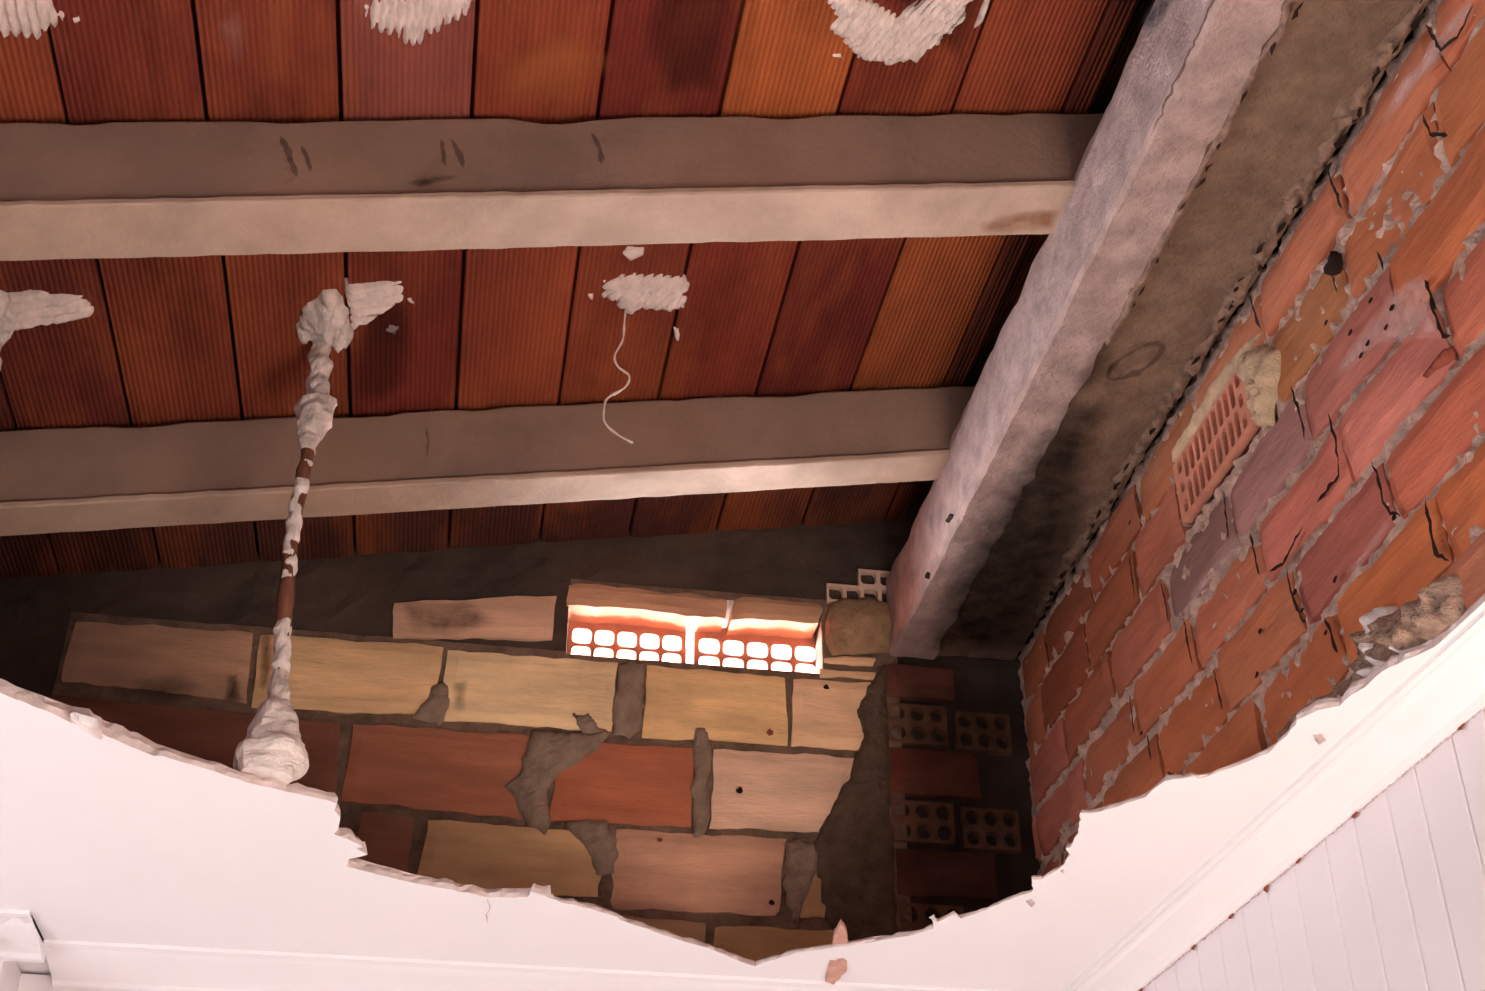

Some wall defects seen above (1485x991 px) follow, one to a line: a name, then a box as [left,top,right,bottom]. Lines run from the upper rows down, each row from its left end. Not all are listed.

peeling [70,712,104,740]
spalling [572,713,610,738]